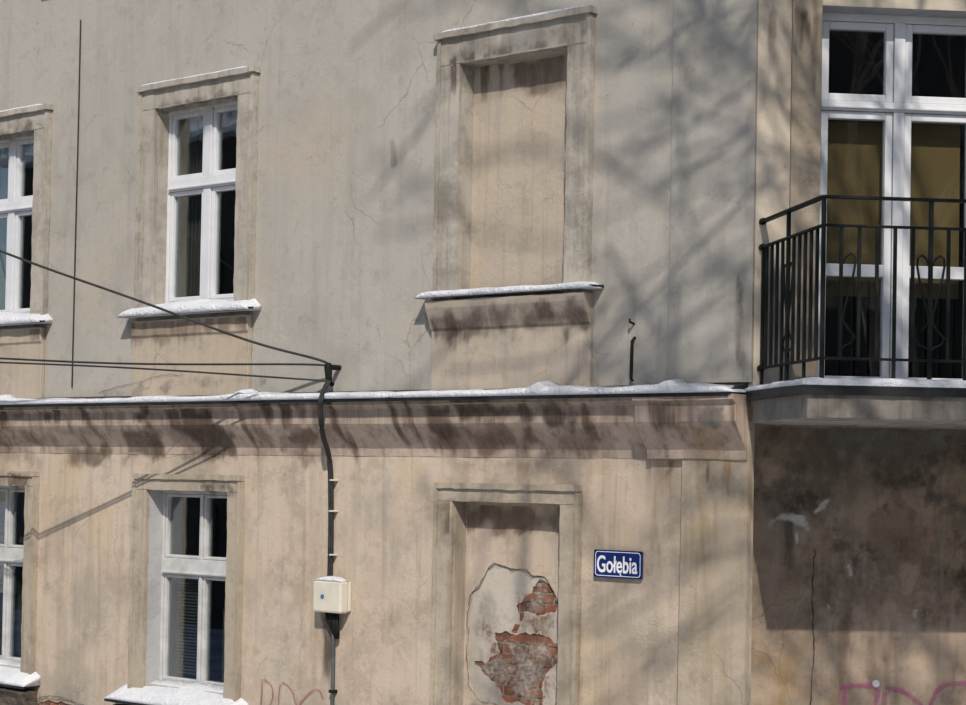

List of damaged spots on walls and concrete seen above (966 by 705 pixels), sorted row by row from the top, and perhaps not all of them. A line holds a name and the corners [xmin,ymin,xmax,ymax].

damp [451,54,488,89]
damp [168,408,235,456]
damp [262,403,290,425]
damp [327,402,353,447]
damp [430,400,593,454]
damp [468,505,535,533]
flaking render [466,563,559,705]
crack [809,552,817,705]